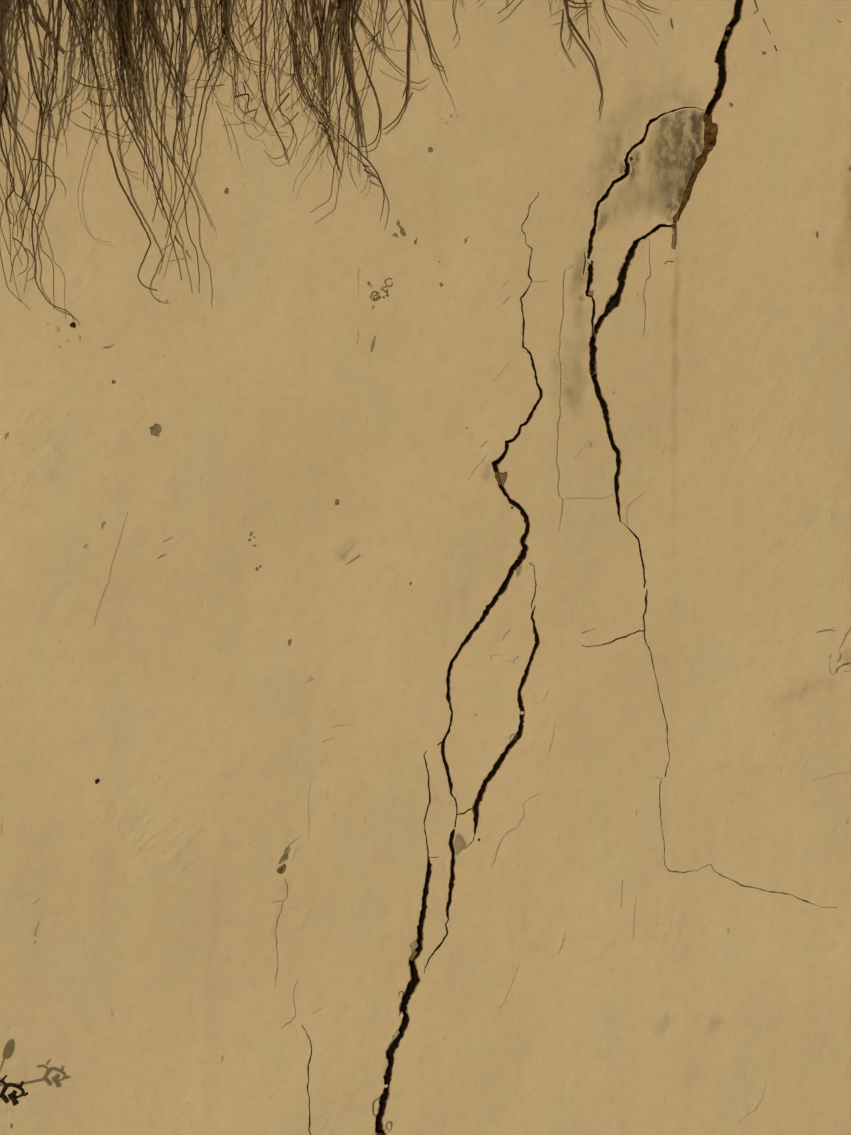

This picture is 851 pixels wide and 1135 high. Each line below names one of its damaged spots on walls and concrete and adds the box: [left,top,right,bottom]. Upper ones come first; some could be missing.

crack [273,879,322,1135]
crack [372,0,837,1135]